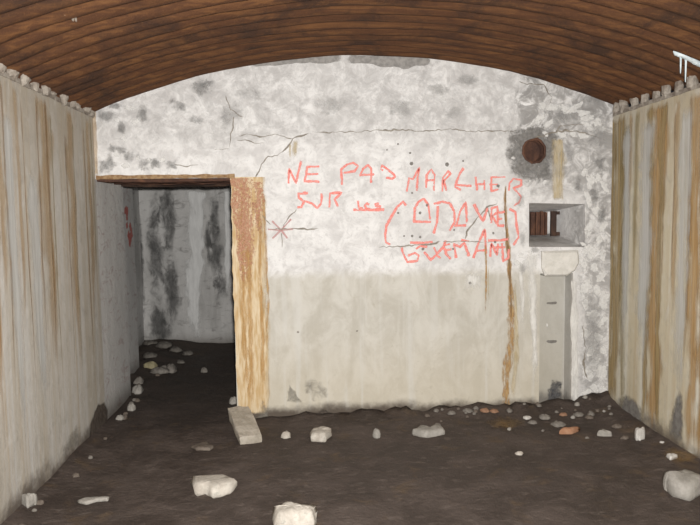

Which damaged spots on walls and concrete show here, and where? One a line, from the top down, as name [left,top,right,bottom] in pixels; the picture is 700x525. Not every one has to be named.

crack [215,97,506,176]
damp [507,127,556,180]
crack [535,124,604,140]
corrosion [96,174,269,413]
damp [140,191,232,339]
crack [263,210,317,245]
crack [382,204,496,248]
corrosion [502,189,519,404]
corrosion [609,119,625,392]
corrosion [643,104,668,418]
damp [621,396,640,420]
damp [671,396,682,439]